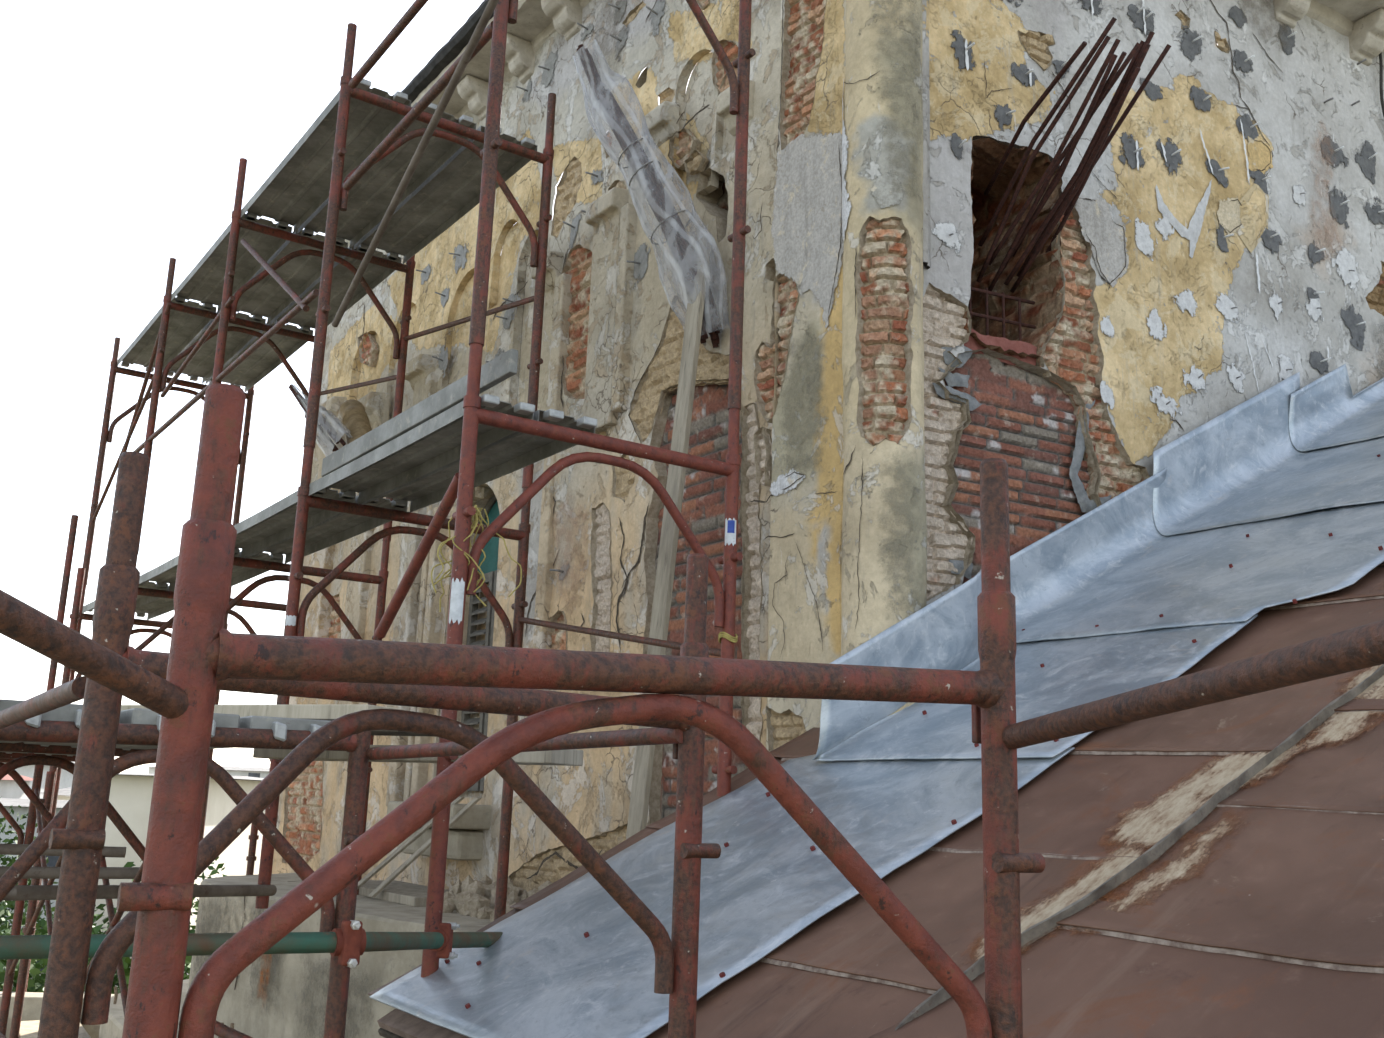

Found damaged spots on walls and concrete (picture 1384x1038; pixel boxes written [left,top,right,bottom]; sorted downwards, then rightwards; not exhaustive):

spalling [1017,30,1056,71]
spalling [551,156,582,238]
spalling [561,244,592,399]
spalling [629,295,729,444]
spalling [739,0,976,660]
spalling [1036,198,1150,507]
peeling [1217,196,1242,237]
peeling [1247,136,1273,174]
spalling [1365,261,1384,316]
spalling [590,455,635,652]
crack [580,504,649,650]